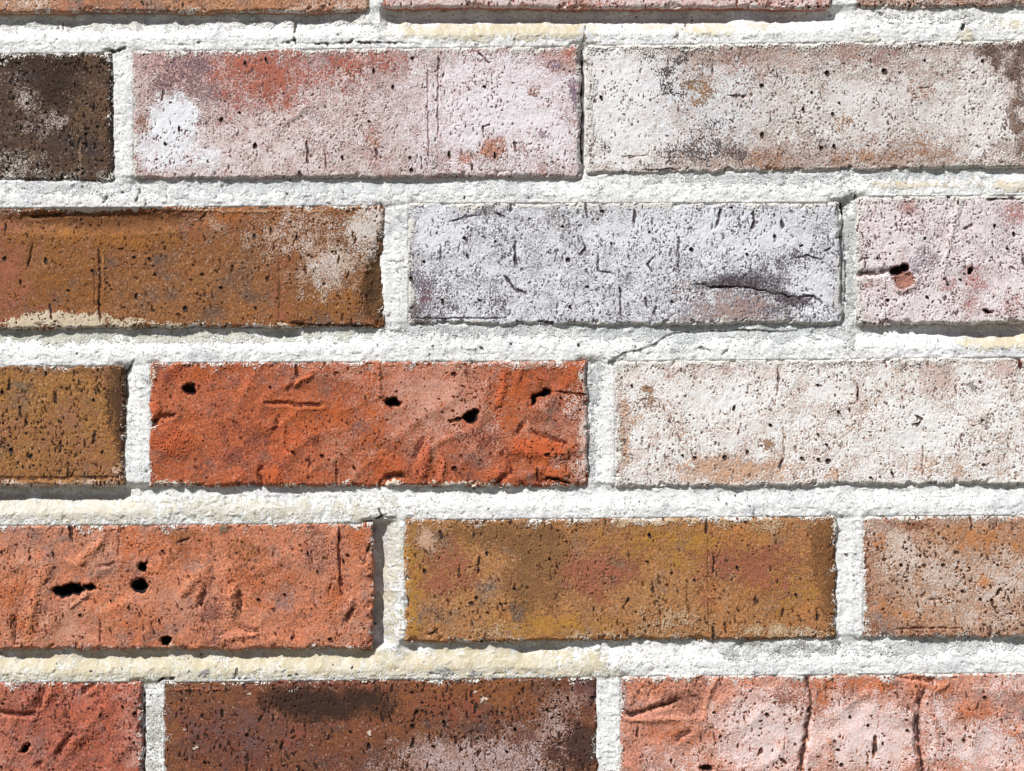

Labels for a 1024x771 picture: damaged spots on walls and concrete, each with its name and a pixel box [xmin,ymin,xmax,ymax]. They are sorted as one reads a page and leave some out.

crack [580,244,779,365]
crack [704,195,890,302]